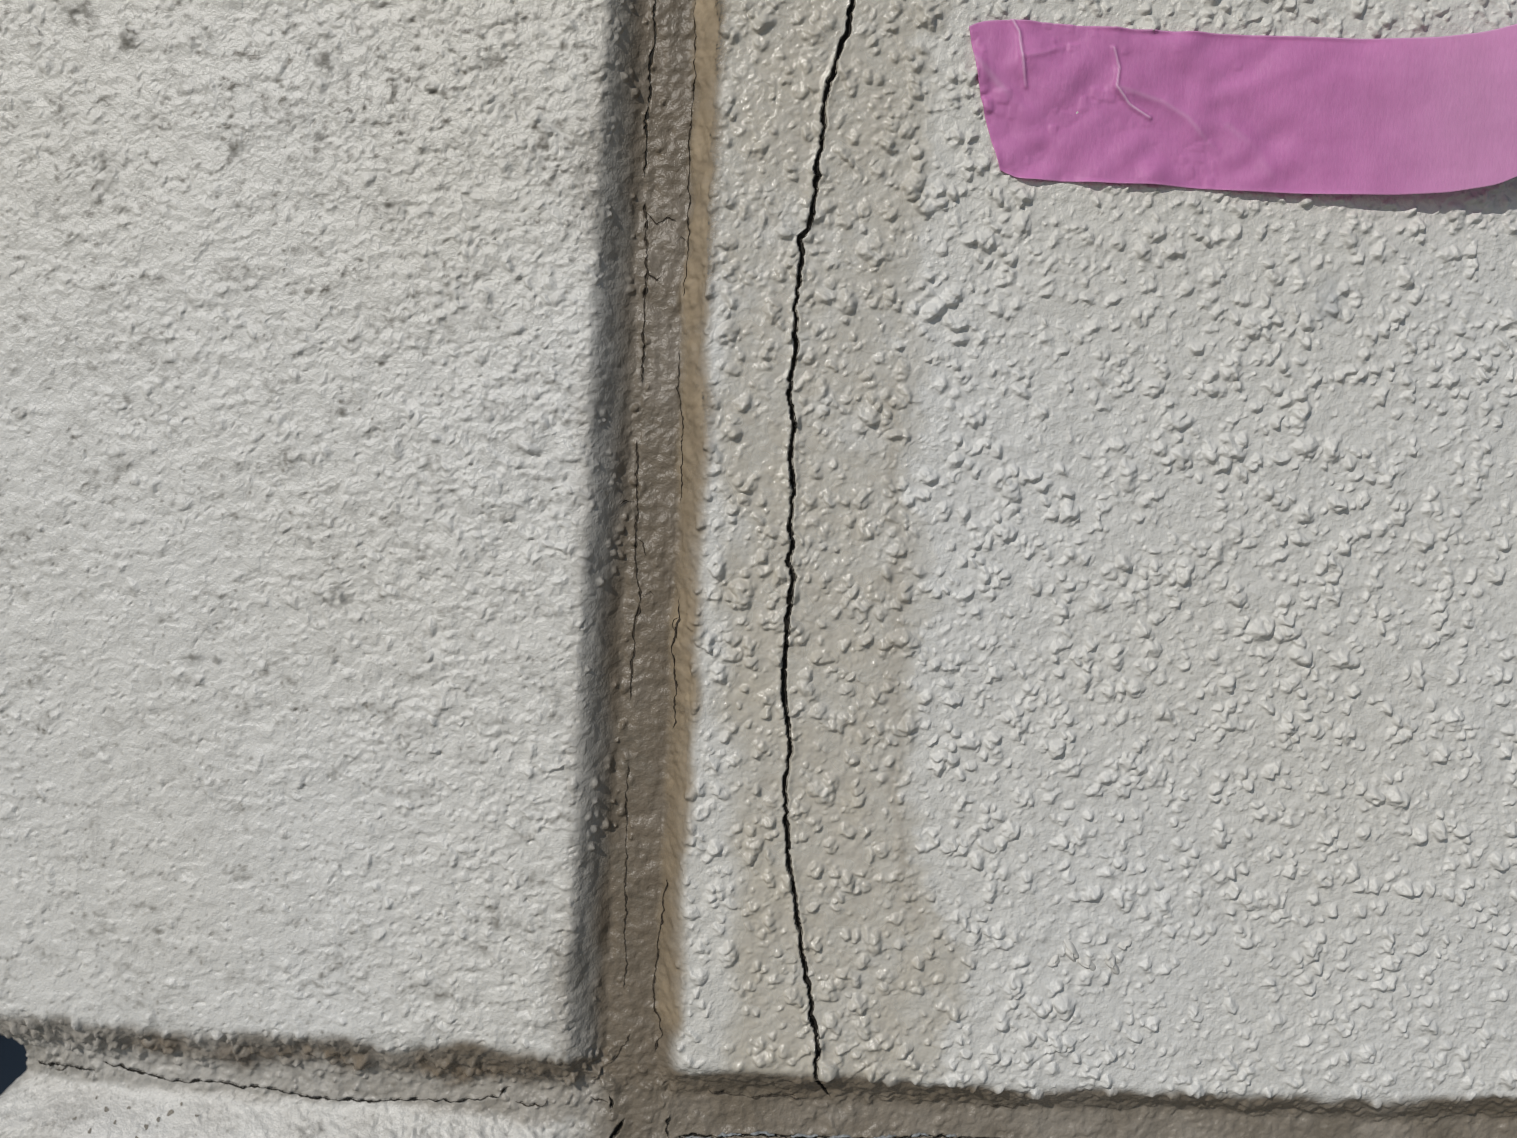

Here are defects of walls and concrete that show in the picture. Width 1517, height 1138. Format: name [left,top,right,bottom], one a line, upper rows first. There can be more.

crack [641,0,696,500]
crack [621,441,680,727]
crack [665,0,1029,1138]
crack [37,1060,547,1107]
crack [592,761,668,1138]